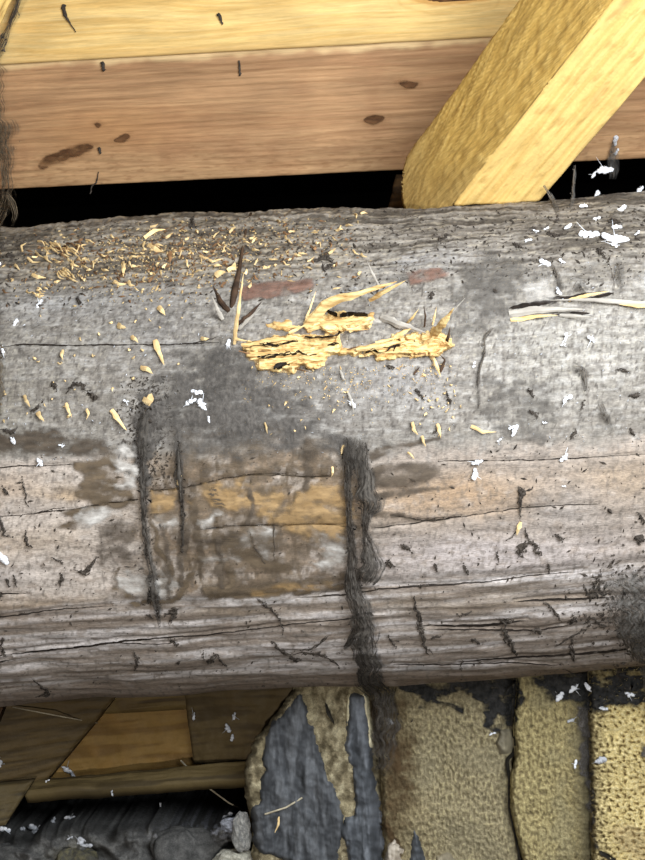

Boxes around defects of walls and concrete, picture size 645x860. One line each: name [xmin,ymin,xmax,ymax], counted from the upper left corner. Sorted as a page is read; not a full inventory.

spalling [212,262,466,377]
leakage [203,347,232,400]
leakage [370,445,440,499]
leakage [0,395,357,607]
crack [0,593,102,618]
crack [0,615,381,663]
crack [297,571,578,598]
crack [422,597,609,631]
peeling [363,693,374,748]